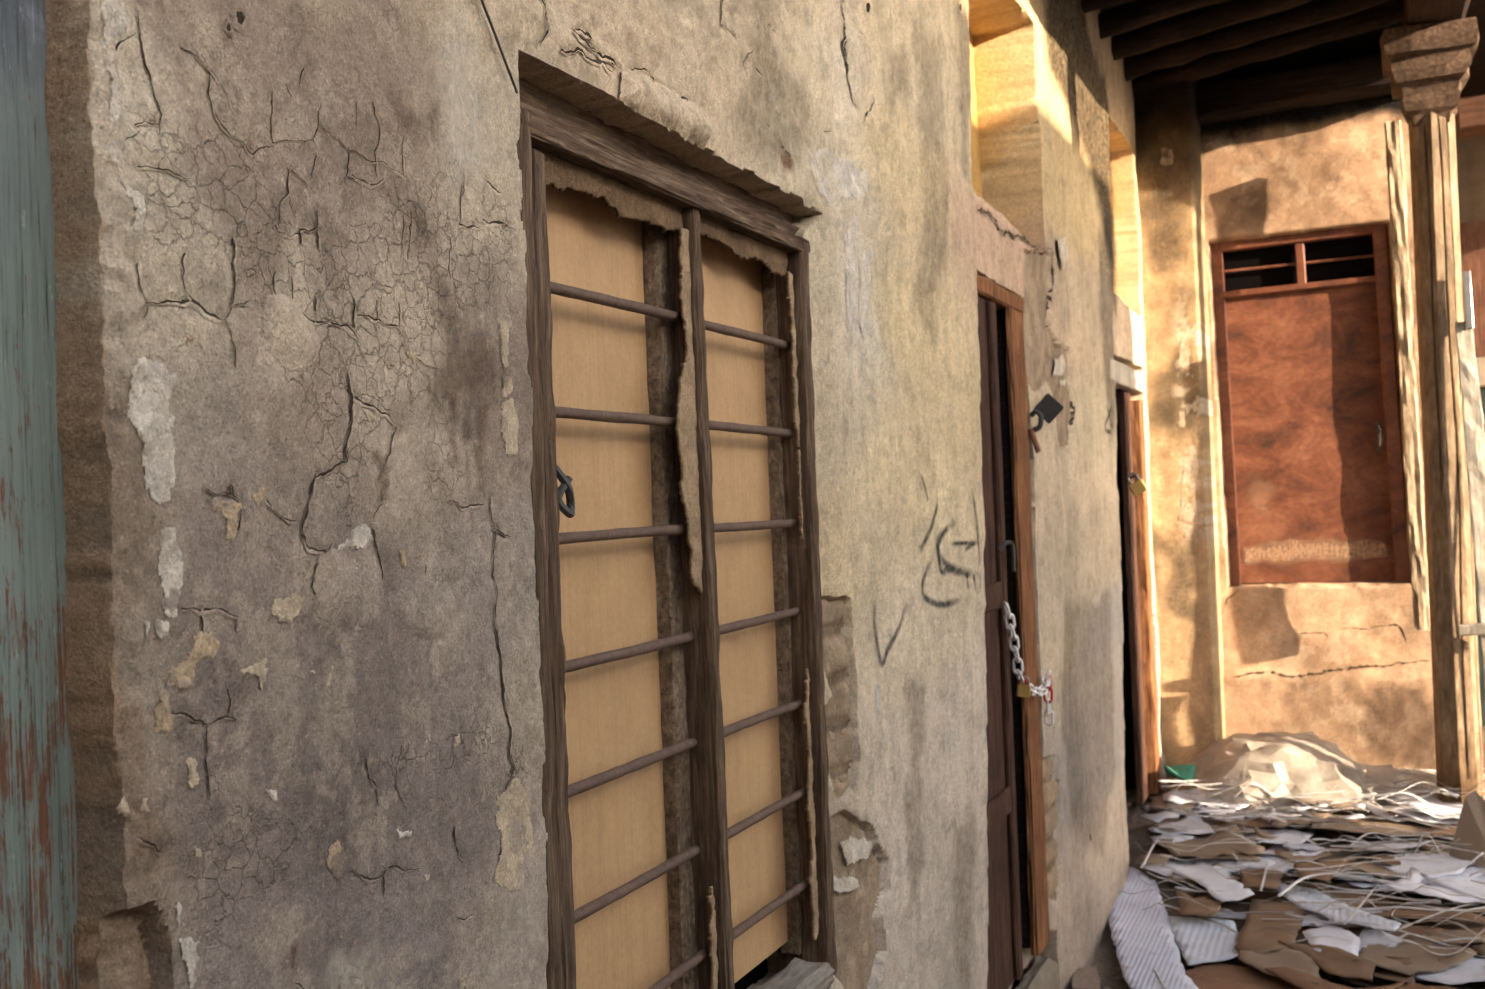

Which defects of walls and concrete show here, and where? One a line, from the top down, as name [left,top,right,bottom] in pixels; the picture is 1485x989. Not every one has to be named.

peeling [99,0,146,236]
crack [115,10,191,182]
crack [541,0,688,101]
crack [764,0,875,163]
crack [136,47,441,636]
crack [448,169,509,280]
crack [973,197,1069,351]
peeling [127,356,178,504]
crack [449,496,516,789]
crack [1234,624,1430,678]
peeling [493,777,534,892]
spalling [822,599,883,989]